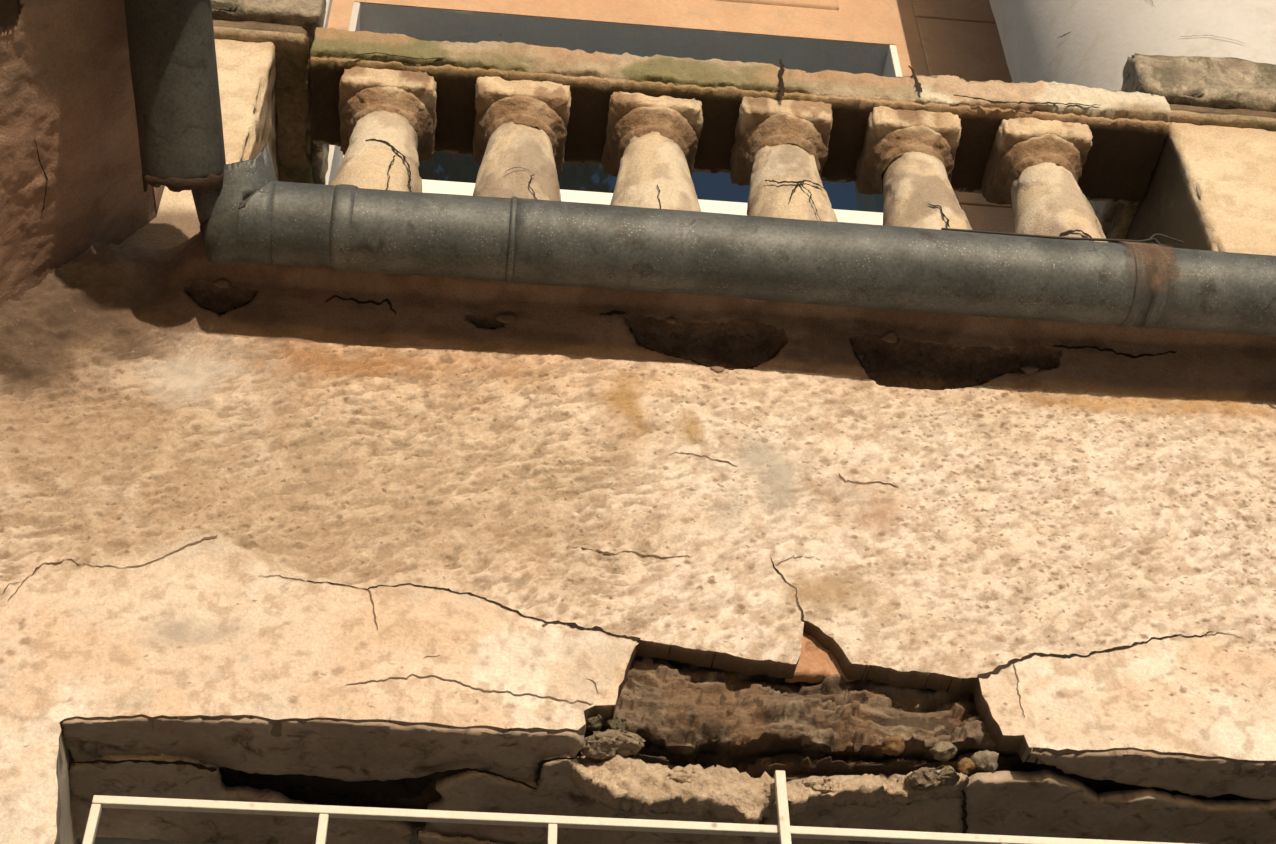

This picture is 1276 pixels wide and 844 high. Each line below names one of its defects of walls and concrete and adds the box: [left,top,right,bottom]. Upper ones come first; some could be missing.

peeling [0,0,21,35]
crack [365,139,412,192]
spalling [184,278,256,314]
spalling [623,315,787,372]
spalling [851,331,1062,390]
crack [3,535,218,600]
crack [260,575,641,641]
crack [771,556,815,622]
crack [347,655,599,705]
crack [977,631,1242,719]
spalling [571,632,1024,824]
crack [71,757,576,801]